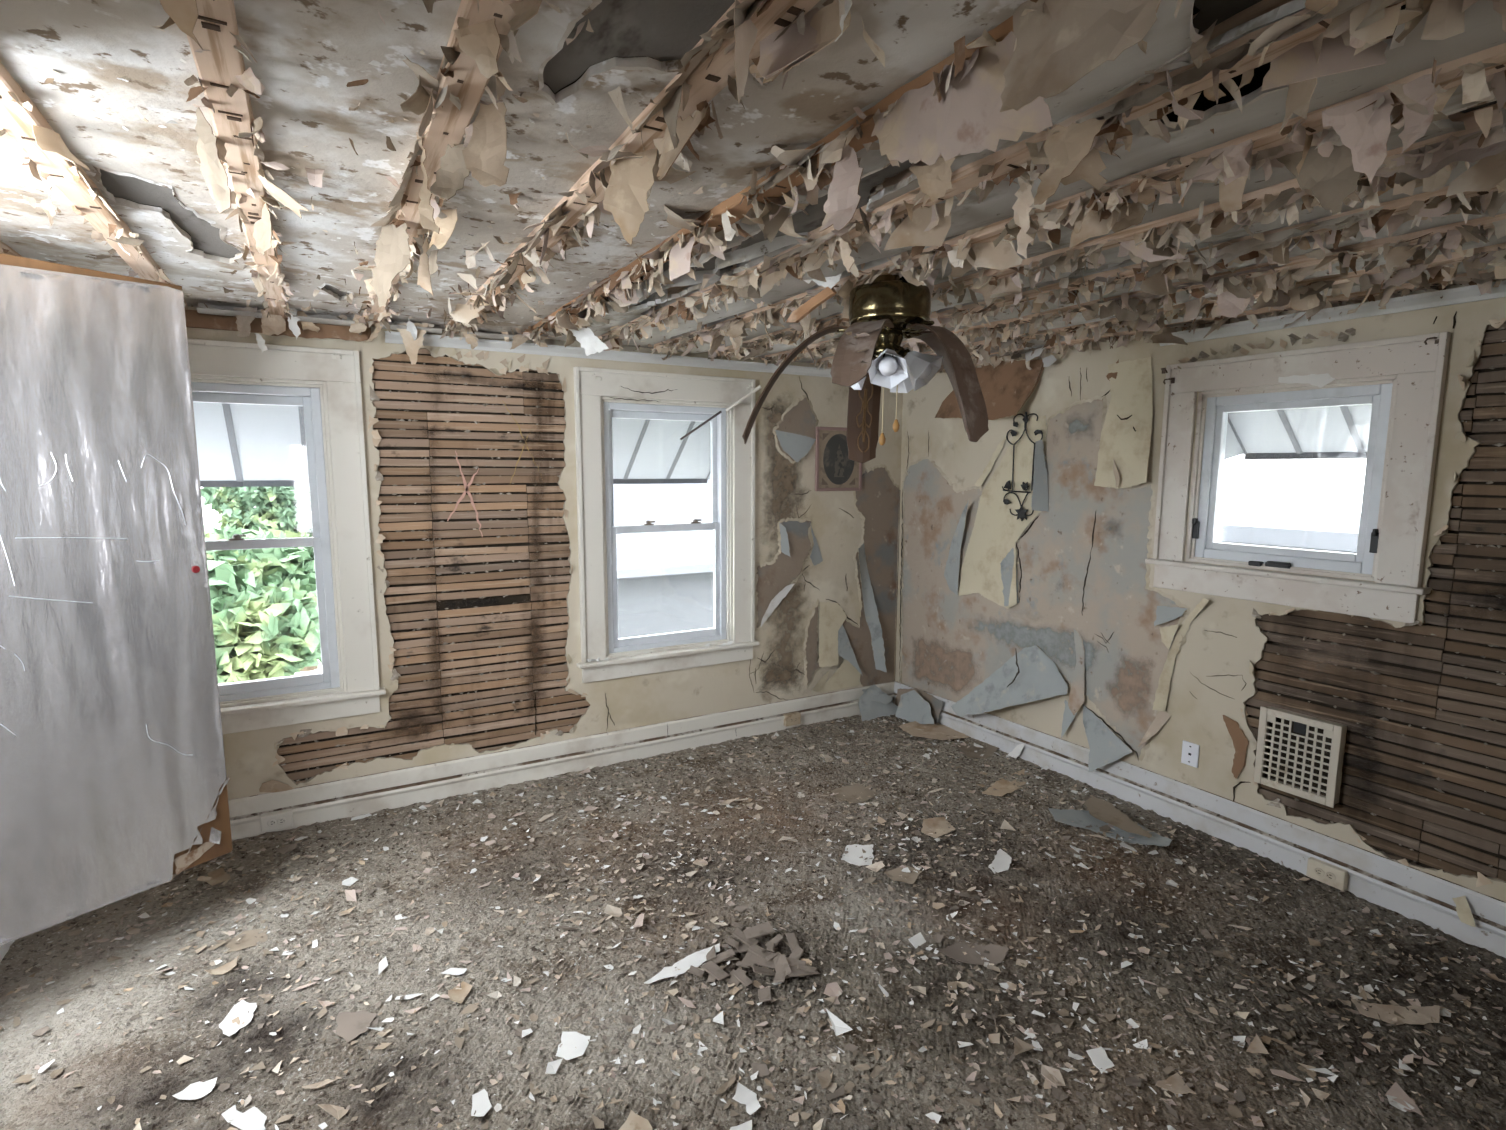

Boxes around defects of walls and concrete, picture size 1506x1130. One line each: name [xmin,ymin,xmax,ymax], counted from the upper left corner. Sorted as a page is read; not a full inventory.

flaking render [0,0,1506,785]
peeling [921,817,955,838]
flaking render [1223,317,1506,887]